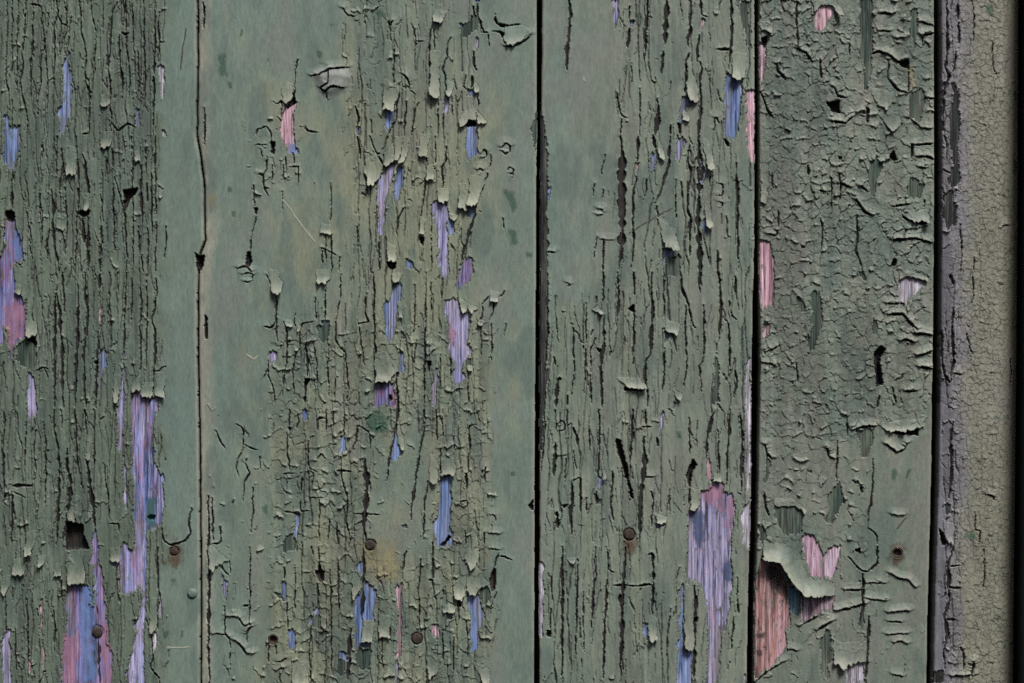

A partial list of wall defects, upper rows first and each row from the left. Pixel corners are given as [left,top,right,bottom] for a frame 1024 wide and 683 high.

peeling [0,219,38,424]
crack [150,5,514,683]
peeling [364,79,487,409]
peeling [429,50,487,161]
peeling [723,0,773,204]
crack [795,2,822,78]
crack [807,166,832,246]
crack [853,214,861,265]
peeling [0,346,166,683]
peeling [337,561,403,683]
peeling [676,358,841,683]
crack [848,460,878,683]